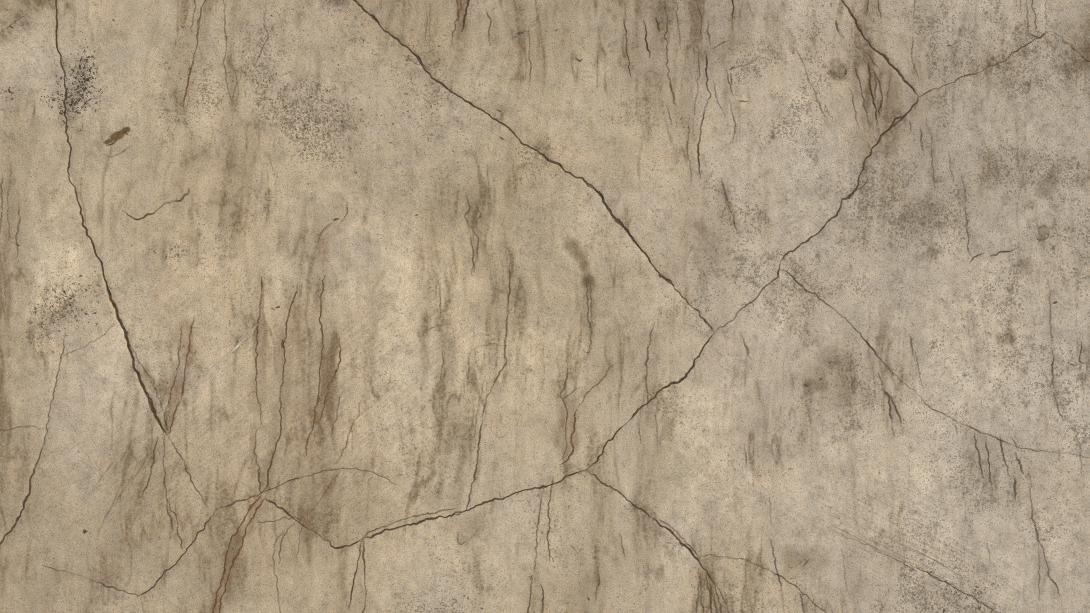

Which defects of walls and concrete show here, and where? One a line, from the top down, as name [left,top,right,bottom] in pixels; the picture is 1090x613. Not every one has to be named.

water stain [41,31,103,131]
crack [746,0,977,306]
crack [56,0,199,492]
crack [330,0,715,583]
crack [0,431,48,545]
crack [109,517,211,595]
crack [233,478,308,529]